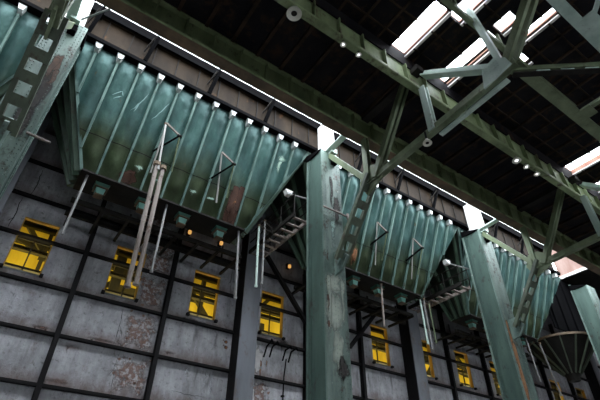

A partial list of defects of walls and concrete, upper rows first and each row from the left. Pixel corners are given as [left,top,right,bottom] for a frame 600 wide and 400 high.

rust [45,55,65,85]
rust [222,186,245,225]
flaking render [112,356,151,395]
rust [506,320,530,400]